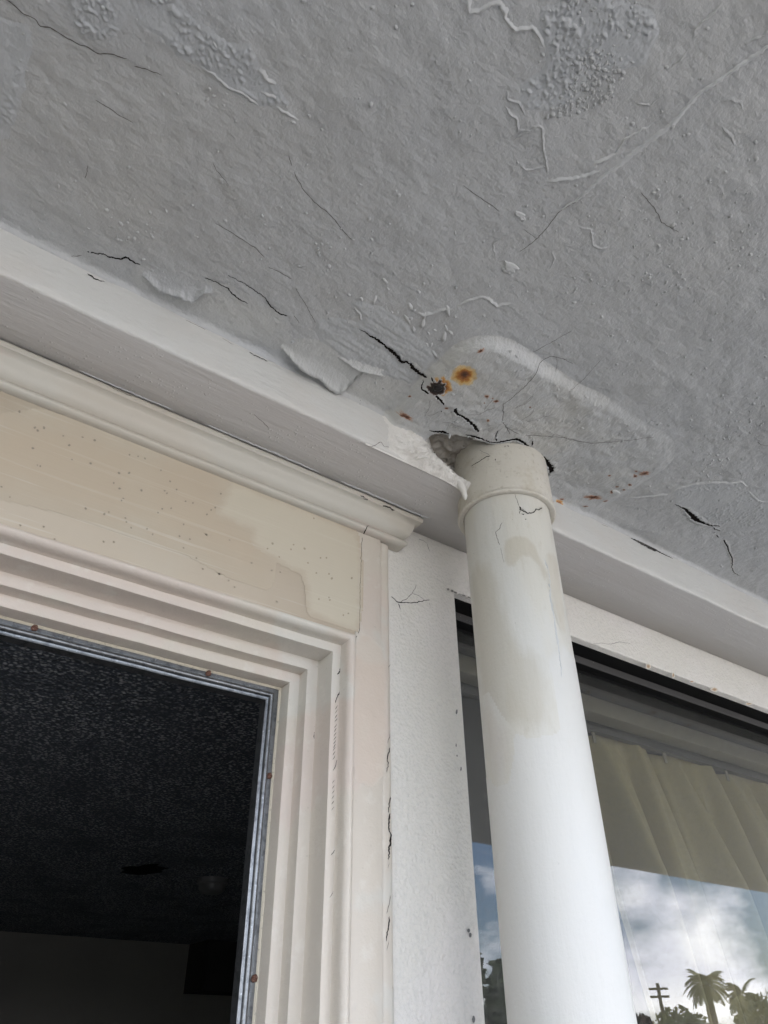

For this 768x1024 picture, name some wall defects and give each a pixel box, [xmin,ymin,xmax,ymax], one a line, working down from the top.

crack [7,0,160,75]
crack [71,251,140,282]
crack [206,224,315,322]
peeling [129,261,410,414]
rust [425,347,485,410]
crack [361,330,653,473]
crack [674,504,741,576]
crack [392,587,430,608]
crack [386,797,394,866]